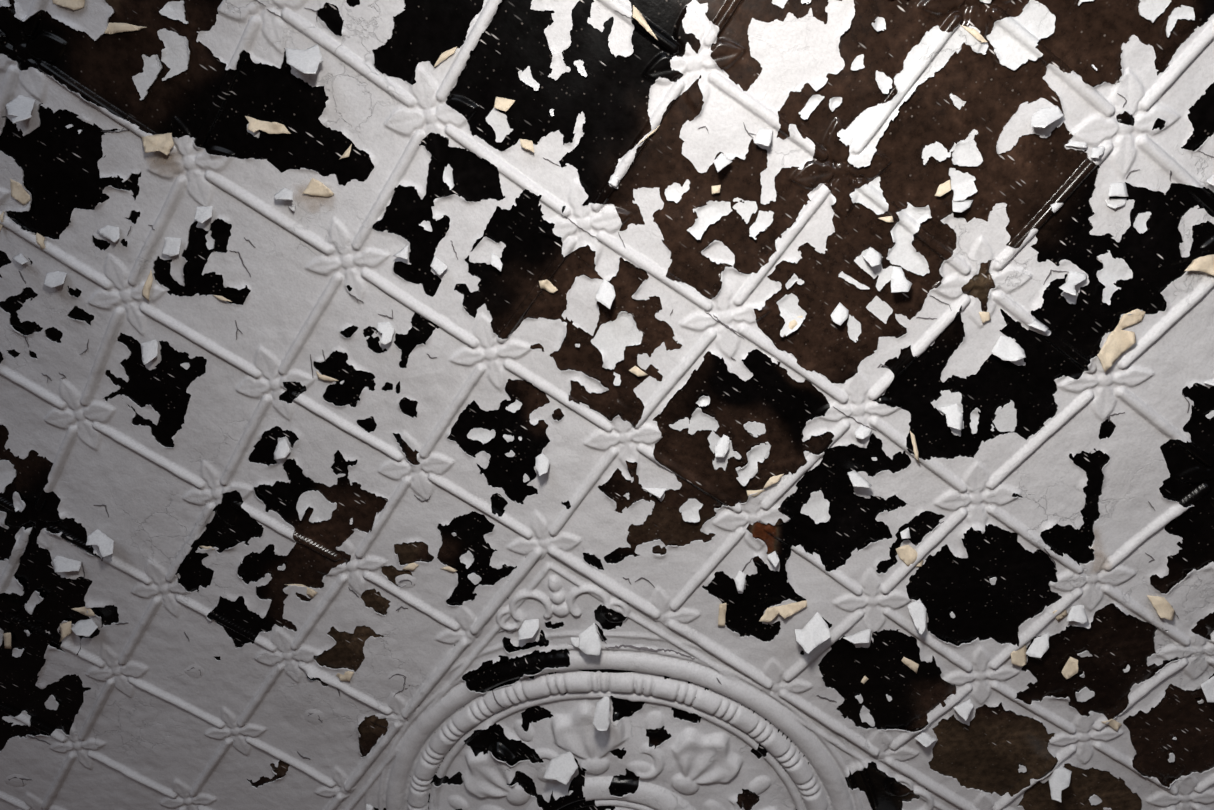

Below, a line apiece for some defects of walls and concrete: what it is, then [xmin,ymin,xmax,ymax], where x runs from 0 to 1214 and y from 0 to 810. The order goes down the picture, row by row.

peeling [0,0,374,251]
peeling [0,250,33,278]
peeling [0,271,94,343]
peeling [142,206,251,305]
peeling [104,333,207,447]
peeling [279,312,439,433]
peeling [373,0,1214,810]
peeling [0,425,119,752]
peeling [175,426,391,648]
peeling [312,625,384,686]
peeling [247,760,290,788]
peeling [359,715,388,757]